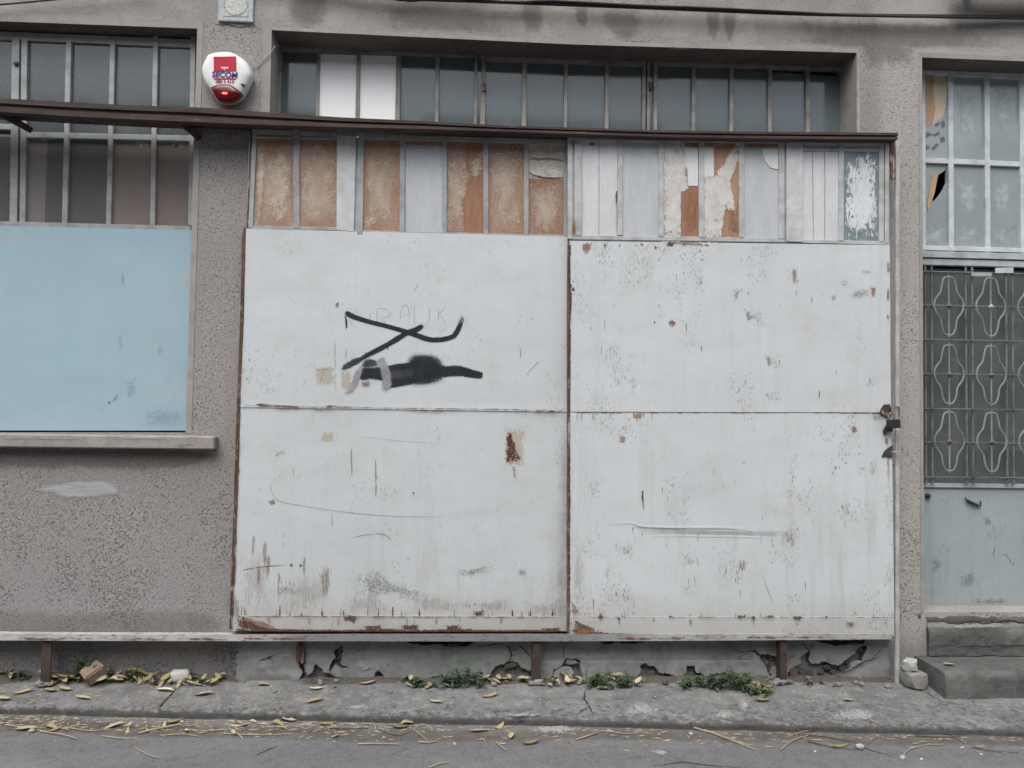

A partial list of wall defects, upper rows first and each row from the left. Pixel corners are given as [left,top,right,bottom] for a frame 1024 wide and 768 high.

peeling [662,142,739,243]
peeling [845,152,878,241]
rust [384,220,663,418]
rust [234,246,302,583]
rust [505,429,524,464]
rust [236,456,685,640]
spalling [298,645,348,679]
crack [480,643,531,661]
rust [698,615,893,626]
crack [787,643,882,677]